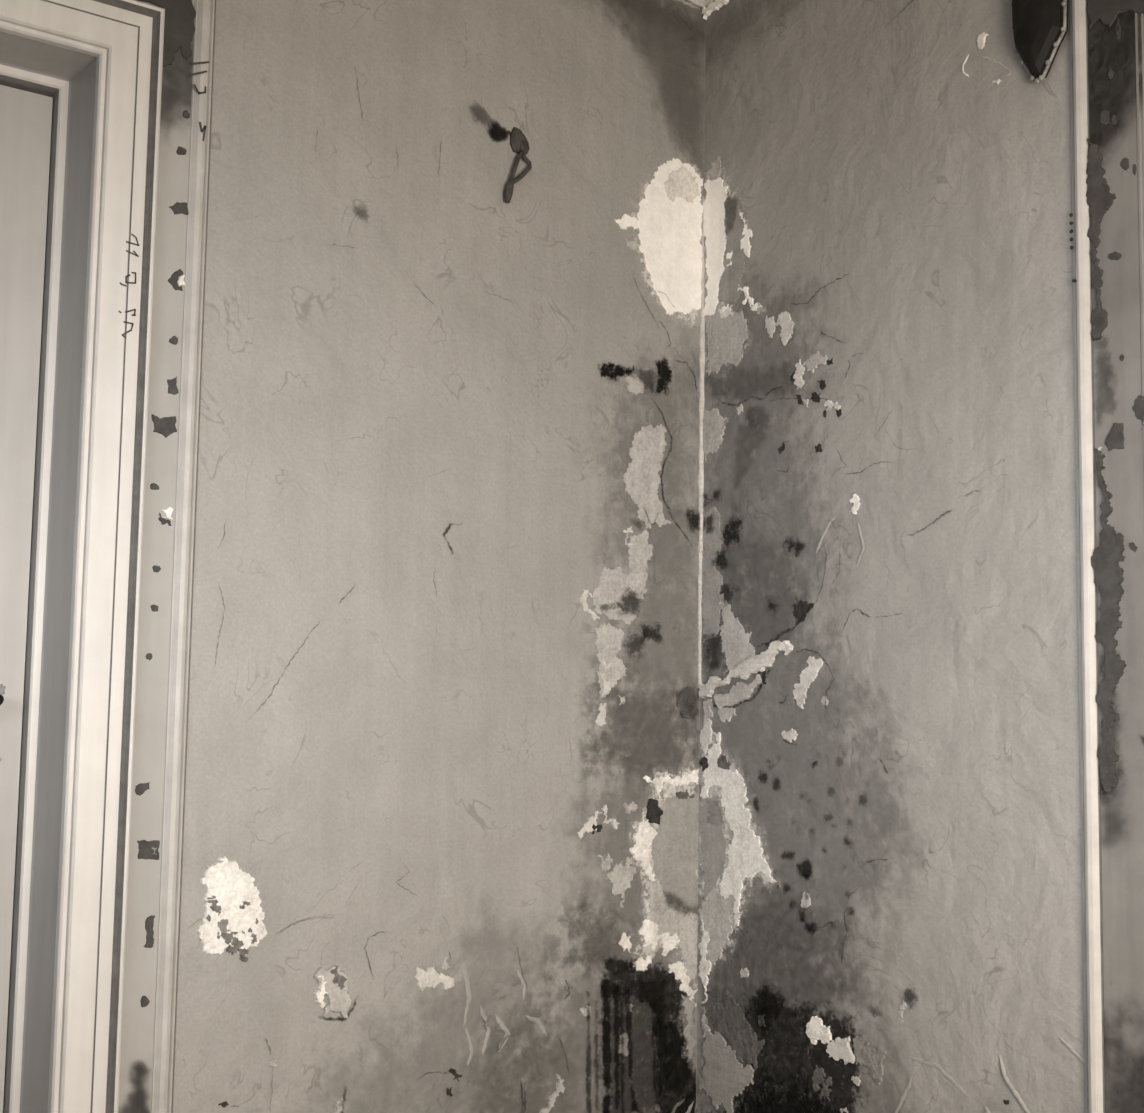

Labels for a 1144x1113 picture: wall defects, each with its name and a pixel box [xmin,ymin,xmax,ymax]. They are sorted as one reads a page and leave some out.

flaking render [614,156,794,376]
peeling [1086,138,1122,341]
leakage [601,359,672,395]
leakage [601,592,641,614]
peeling [580,424,672,727]
leakage [687,492,741,567]
peeling [1091,423,1138,795]
spalling [196,856,267,962]
spalling [578,506,833,1113]
leakage [782,852,812,878]
leakage [586,957,696,1113]
leakage [725,986,860,1113]